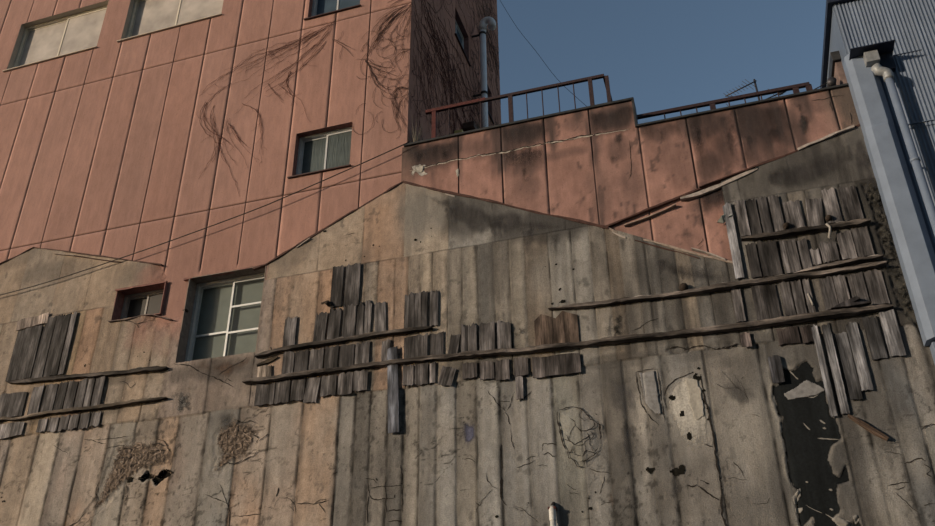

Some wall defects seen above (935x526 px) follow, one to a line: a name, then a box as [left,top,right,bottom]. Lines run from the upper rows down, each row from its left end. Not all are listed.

crack [410,128,632,178]
water stain [699,188,723,202]
spalling [215,420,268,470]
peeling [772,361,861,526]
spalling [88,439,171,514]